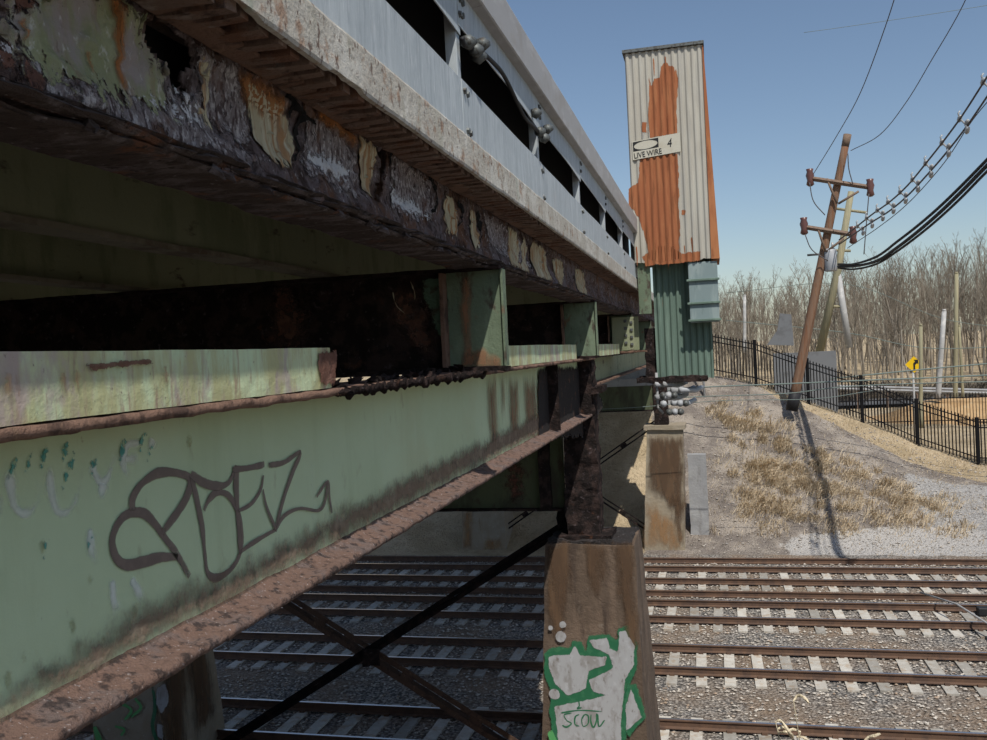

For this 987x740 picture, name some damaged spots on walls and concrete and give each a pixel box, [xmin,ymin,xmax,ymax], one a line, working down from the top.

peeling [0,0,172,115]
rust [113,7,127,87]
peeling [197,56,212,129]
peeling [248,80,295,170]
rust [642,57,678,138]
peeling [359,135,377,199]
peeling [443,194,480,250]
peeling [507,226,588,295]
rust [629,153,700,267]
rust [43,279,584,687]